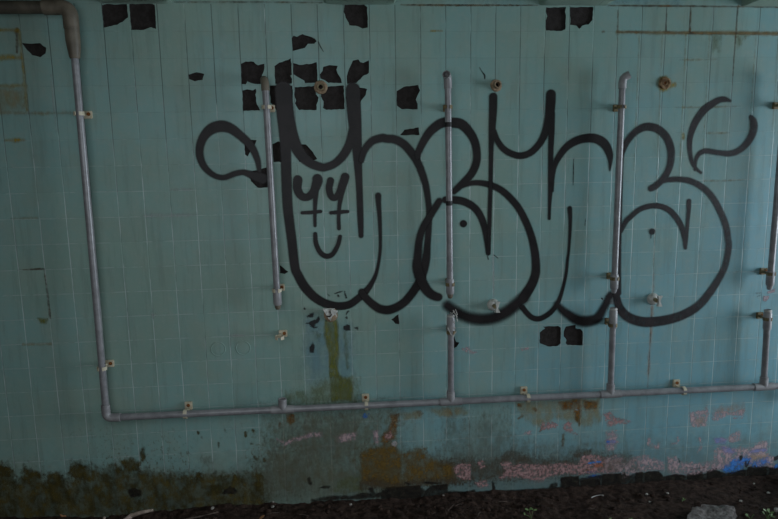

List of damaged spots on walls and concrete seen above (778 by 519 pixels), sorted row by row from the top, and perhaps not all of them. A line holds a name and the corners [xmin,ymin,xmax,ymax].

peeling [102,0,156,30]
peeling [344,5,368,29]
peeling [546,7,593,31]
spalling [22,43,46,57]
spalling [241,34,369,111]
peeling [397,85,420,110]
leakage [0,0,122,422]
peeling [539,325,583,347]
leakage [119,307,778,421]
corrosion [518,399,598,428]
corrosion [360,414,464,490]
peeling [454,412,778,494]